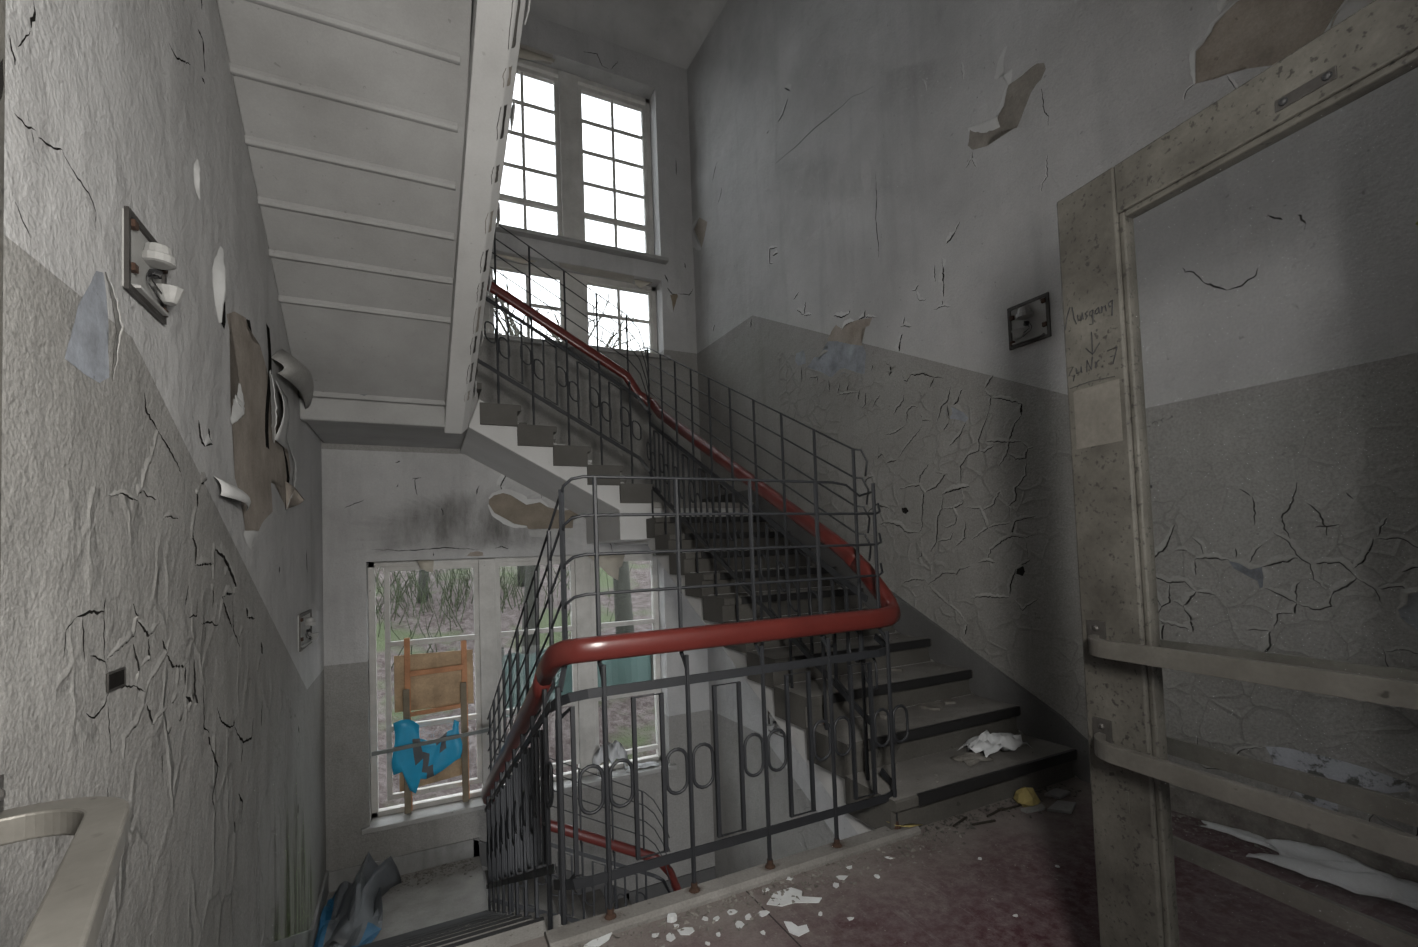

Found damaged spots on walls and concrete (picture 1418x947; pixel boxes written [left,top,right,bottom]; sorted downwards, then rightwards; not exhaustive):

peeling [968,46,1046,150]
peeling [1189,0,1344,84]
peeling [65,271,125,383]
crack [1183,268,1258,290]
peeling [212,246,314,549]
crack [794,221,1038,635]
crack [64,393,263,832]
peeling [488,489,578,539]
crack [1154,483,1418,652]
peeling [1264,747,1418,801]